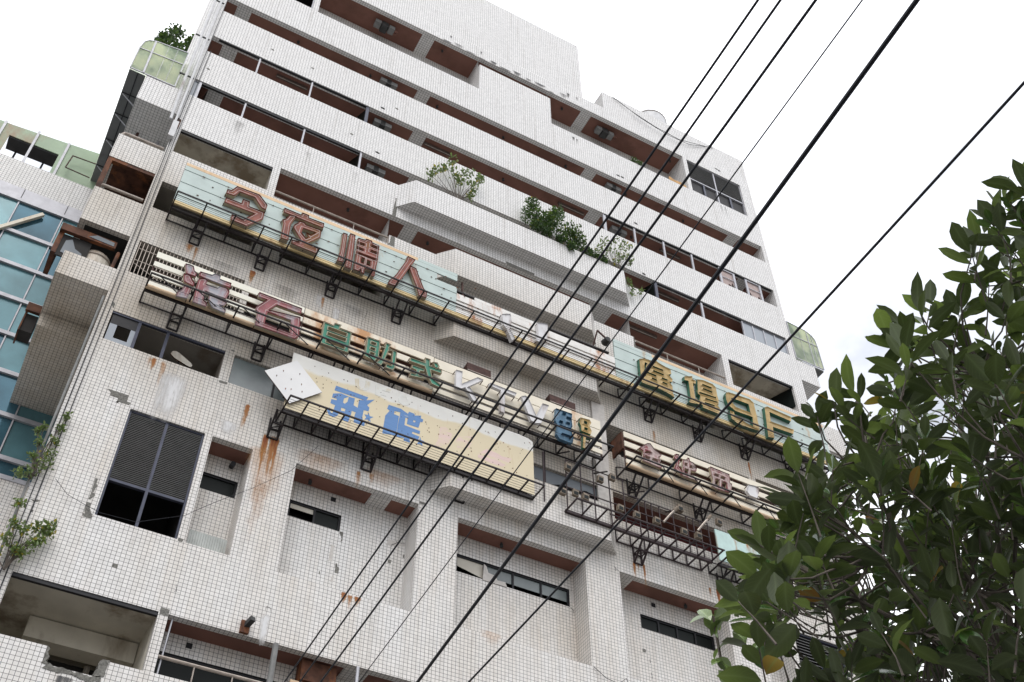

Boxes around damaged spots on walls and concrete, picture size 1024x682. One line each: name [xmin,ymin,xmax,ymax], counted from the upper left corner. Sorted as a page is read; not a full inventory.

peeling [106,388,130,405]
water stain [155,376,185,412]
corrosion [259,434,279,472]
spalling [41,645,110,682]